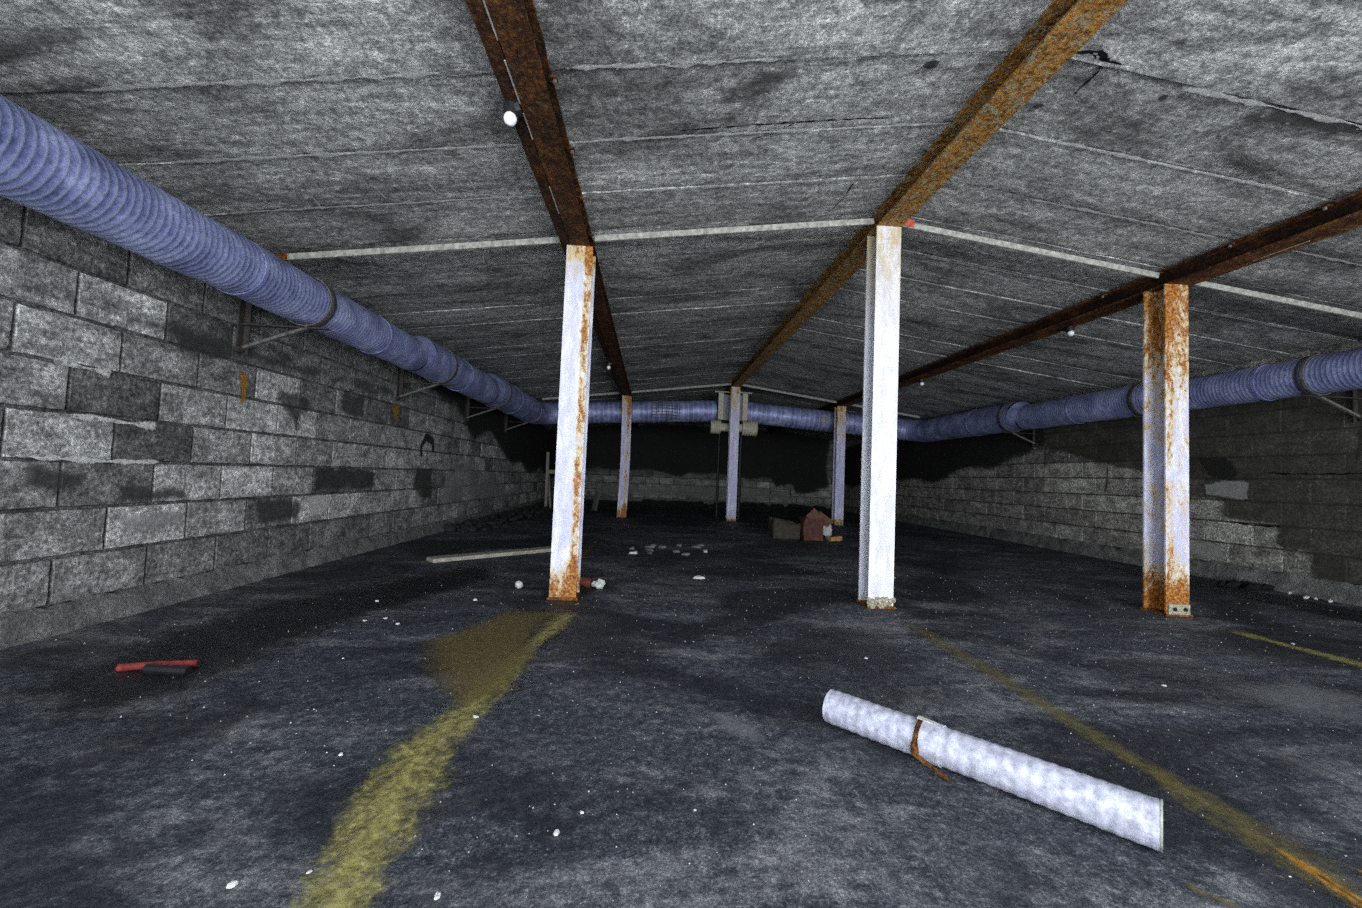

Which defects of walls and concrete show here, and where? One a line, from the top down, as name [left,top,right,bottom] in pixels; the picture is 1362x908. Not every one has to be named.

corrosion [240,373,248,404]